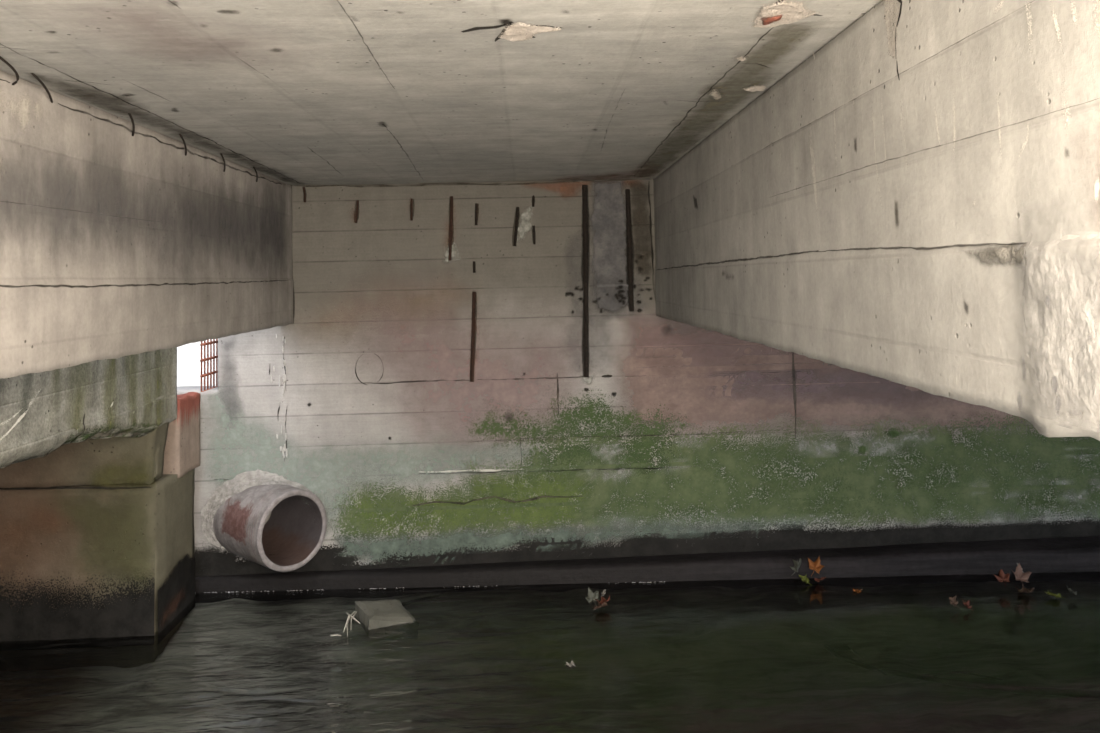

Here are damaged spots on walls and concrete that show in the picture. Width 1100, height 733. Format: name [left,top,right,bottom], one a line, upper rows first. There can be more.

crack [339,3,395,89]
spalling [461,19,564,42]
spalling [752,0,822,28]
crack [884,0,970,80]
water stain [62,84,162,121]
crack [1,29,1026,272]
water stain [0,169,283,259]
spalling [974,244,1026,264]
crack [0,280,295,312]
water stain [212,395,532,515]
water stain [0,510,1100,651]